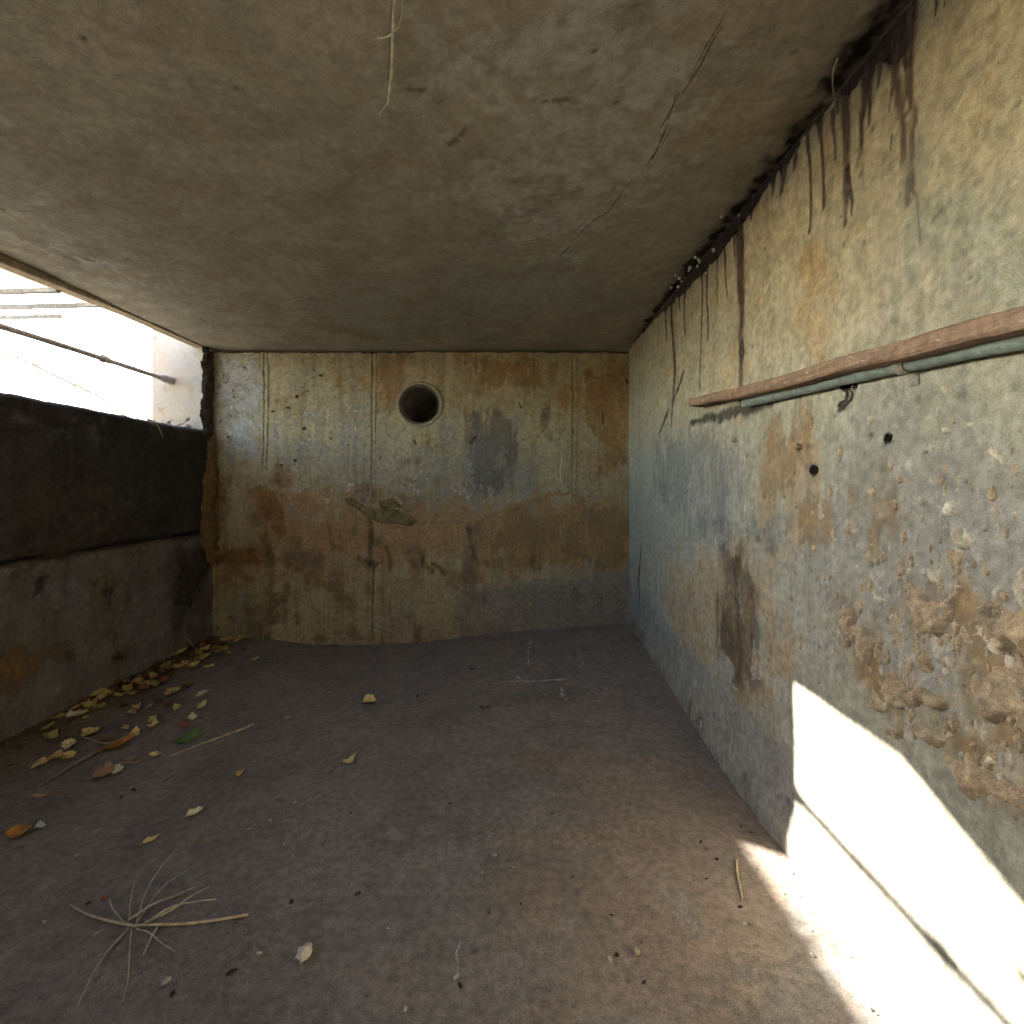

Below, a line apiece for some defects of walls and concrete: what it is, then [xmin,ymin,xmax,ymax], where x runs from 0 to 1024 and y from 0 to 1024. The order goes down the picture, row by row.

crack [646,14,725,166]
leakage [638,0,921,429]
spalling [342,494,418,526]
peeling [793,461,1024,780]